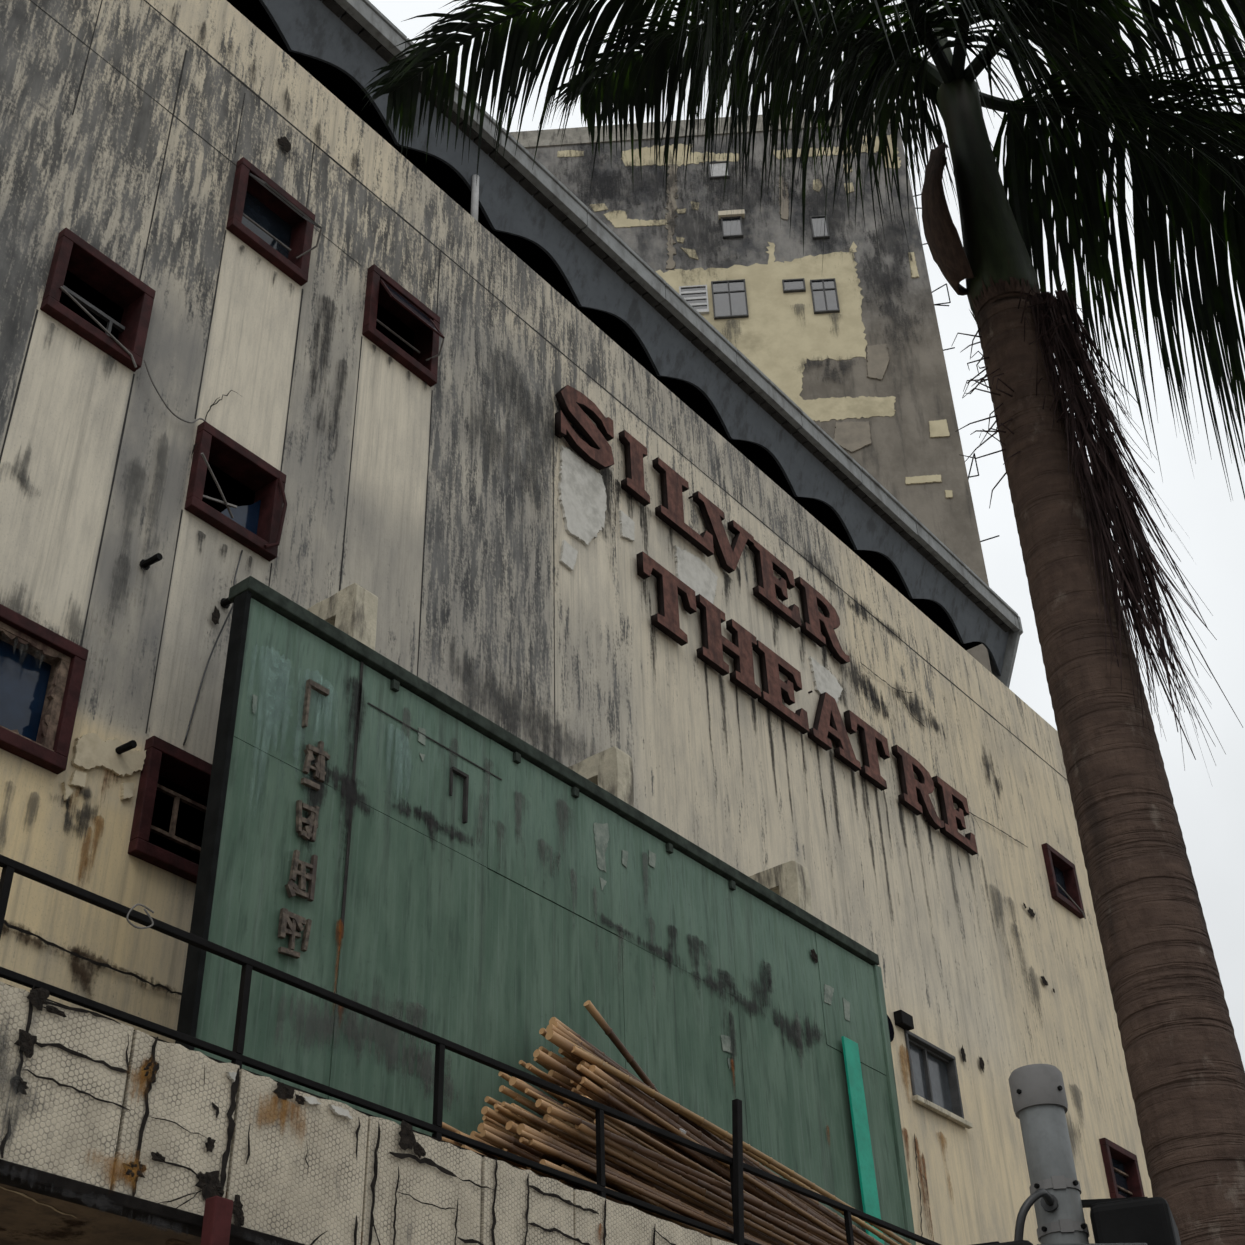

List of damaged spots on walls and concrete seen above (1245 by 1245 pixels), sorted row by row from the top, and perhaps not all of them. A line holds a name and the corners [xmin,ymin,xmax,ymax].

peeling [773,135,901,193]
peeling [590,144,896,453]
water stain [311,295,348,448]
peeling [558,446,635,571]
peeling [673,545,719,604]
water stain [705,664,793,816]
water stain [821,645,940,732]
water stain [62,787,98,833]
water stain [851,770,958,916]
crack [16,983,250,1208]
crack [0,1117,76,1218]
crack [310,1117,607,1245]